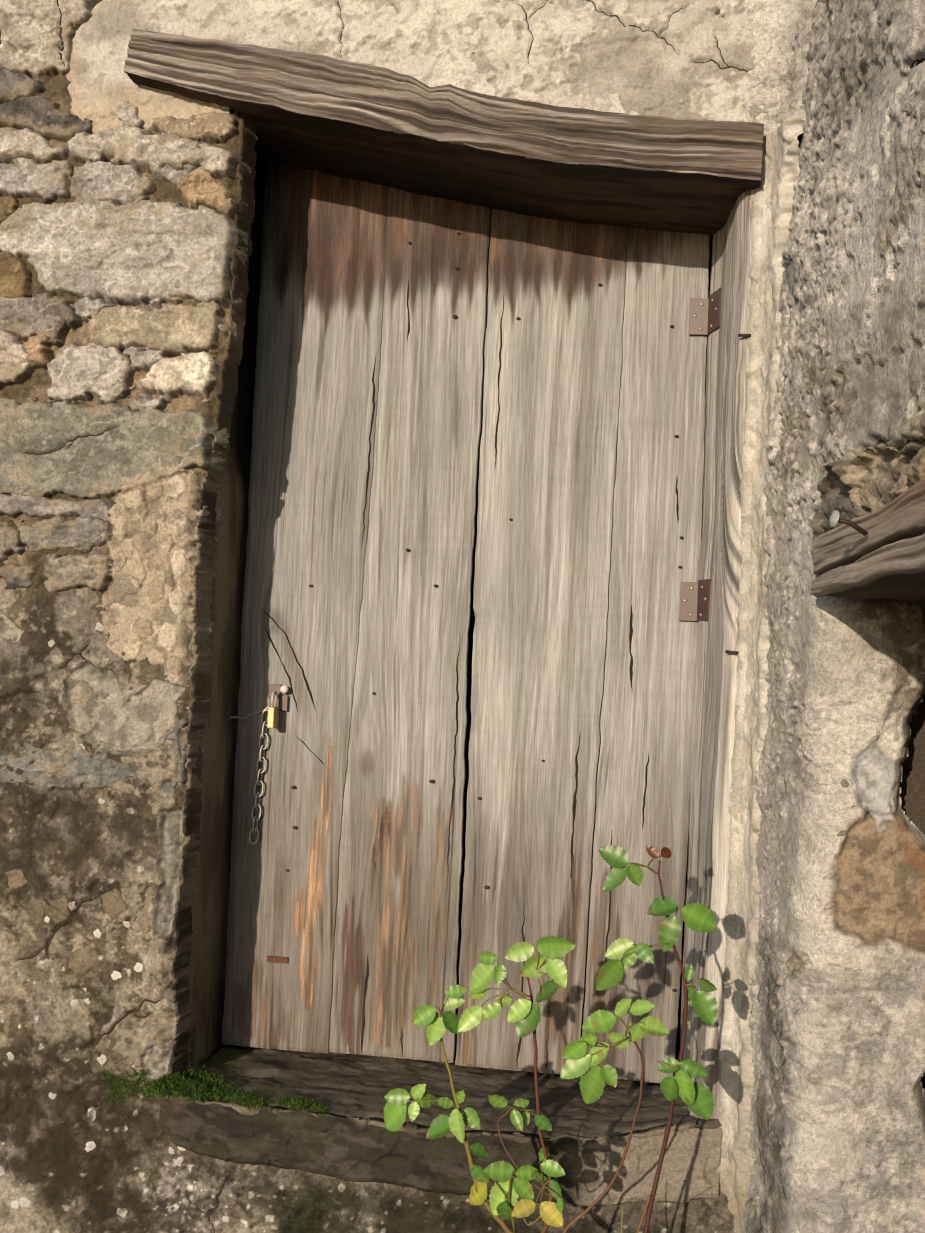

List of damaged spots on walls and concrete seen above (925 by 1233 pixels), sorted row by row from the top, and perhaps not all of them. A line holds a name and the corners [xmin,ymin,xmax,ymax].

crack [516,0,748,72]
crack [911,58,925,69]
spalling [899,436,925,460]
spalling [823,734,925,952]
crack [16,884,113,963]
crack [85,999,162,1050]
water stain [0,1054,156,1233]